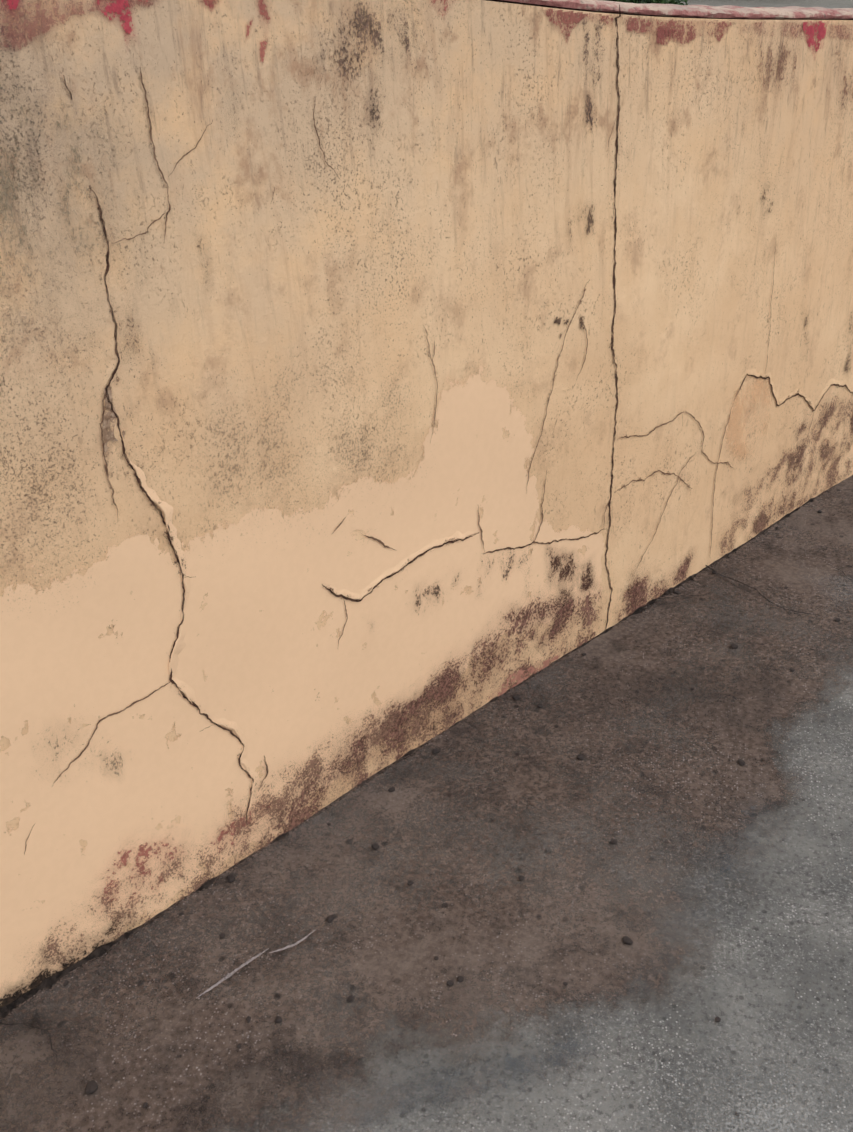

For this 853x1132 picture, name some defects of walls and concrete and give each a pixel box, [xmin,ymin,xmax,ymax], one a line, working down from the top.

crack [51,56,74,100]
crack [54,67,268,824]
peeling [0,359,604,1006]
water stain [27,549,603,978]
crack [313,97,340,179]
crack [321,4,853,645]
water stain [618,555,693,622]
water stain [720,396,853,556]